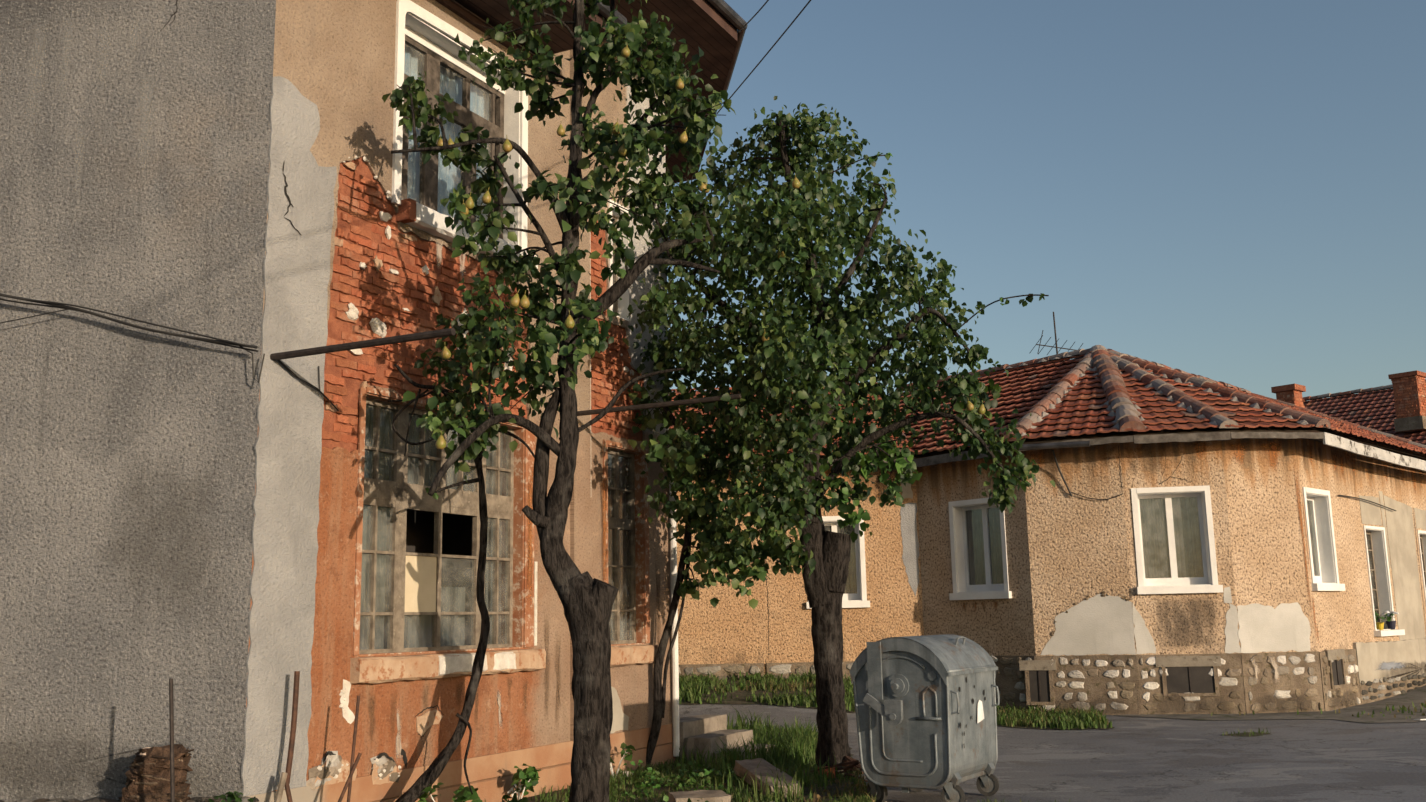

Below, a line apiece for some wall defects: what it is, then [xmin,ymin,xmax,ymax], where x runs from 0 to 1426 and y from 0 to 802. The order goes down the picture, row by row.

crack [283,160,301,235]
flaking render [322,156,529,452]
flaking render [590,220,644,441]
flaking render [339,679,355,724]
flaking render [415,705,444,736]
flaking render [306,751,401,791]